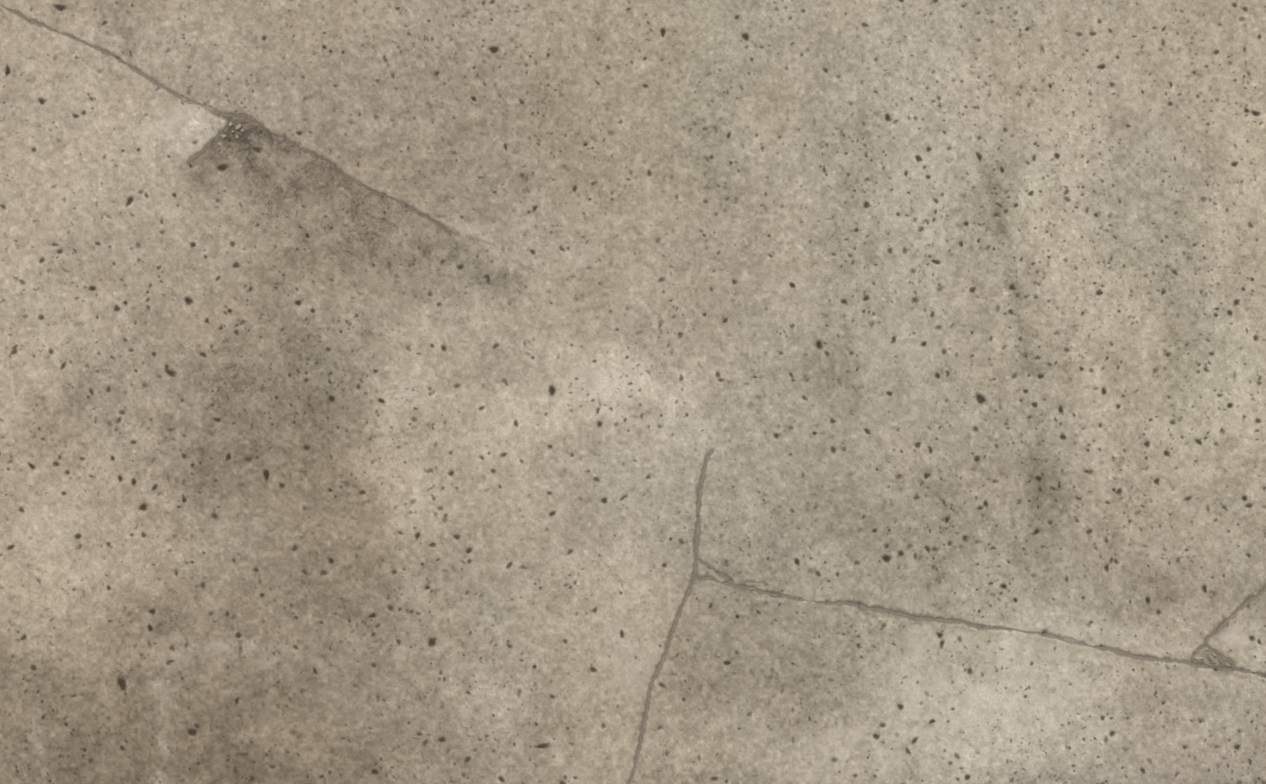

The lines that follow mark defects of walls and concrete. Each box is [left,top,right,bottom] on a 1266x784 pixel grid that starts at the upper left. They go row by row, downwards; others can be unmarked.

crack [6,8,524,269]
crack [628,450,1266,784]